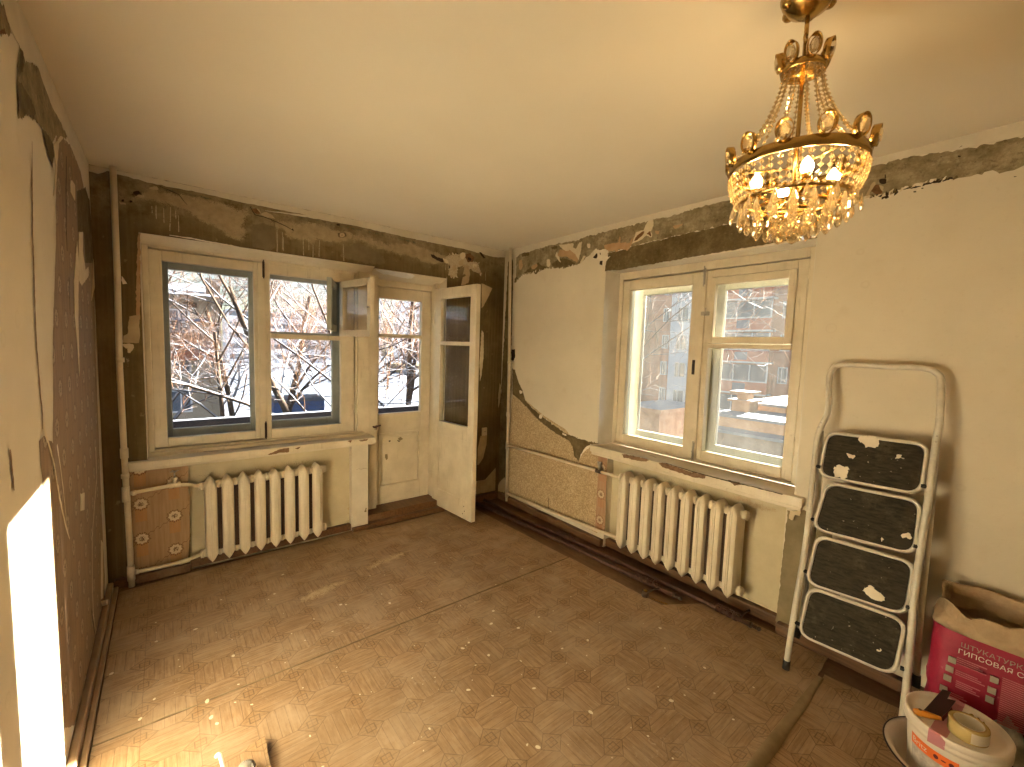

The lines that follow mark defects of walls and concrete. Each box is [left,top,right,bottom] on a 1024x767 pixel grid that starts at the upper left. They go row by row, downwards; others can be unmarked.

flaking render [0,2,11,37]
flaking render [17,46,67,168]
flaking render [77,187,93,264]
peeling [120,186,485,285]
spalling [514,137,1024,283]